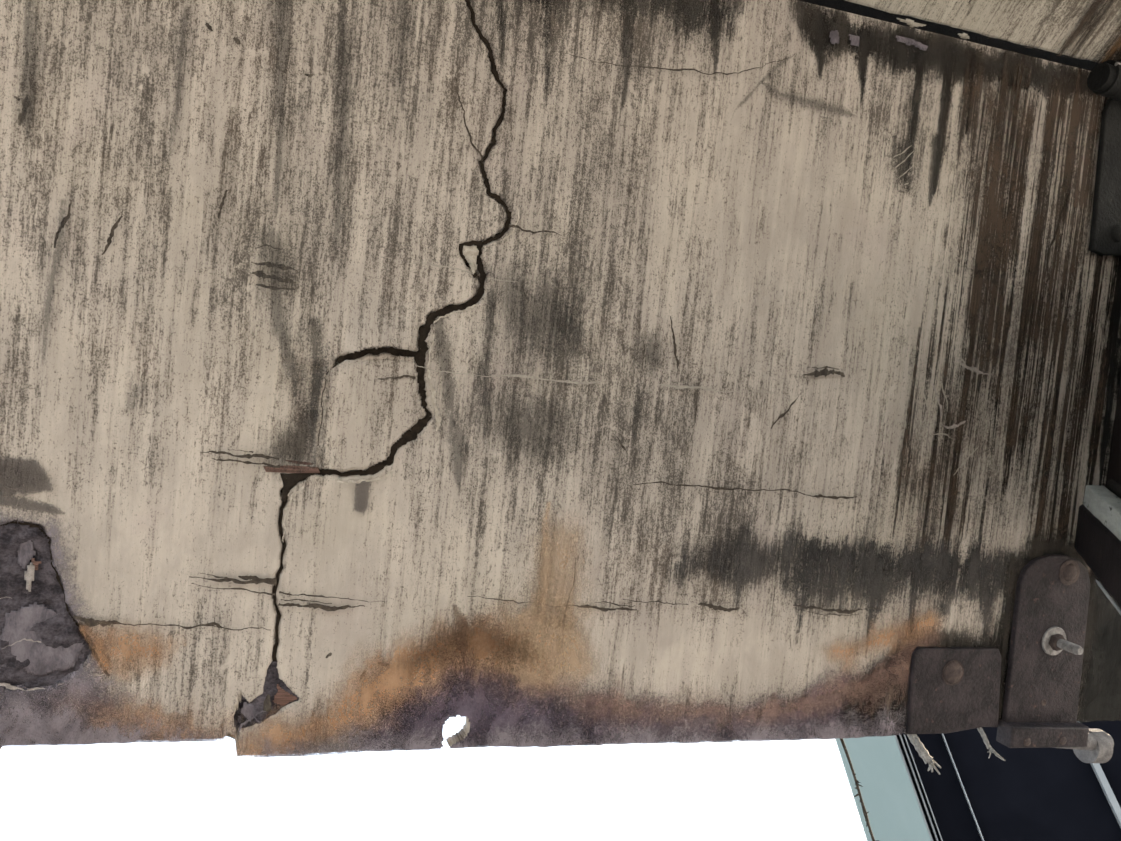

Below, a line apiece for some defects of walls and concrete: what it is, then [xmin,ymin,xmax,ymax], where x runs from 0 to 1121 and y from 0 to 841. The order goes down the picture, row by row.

crack [54,200,72,248]
crack [73,0,562,676]
water stain [260,0,1121,757]
spalling [0,520,123,691]
rust [59,705,219,742]
spalling [234,661,299,732]
rust [238,606,937,757]